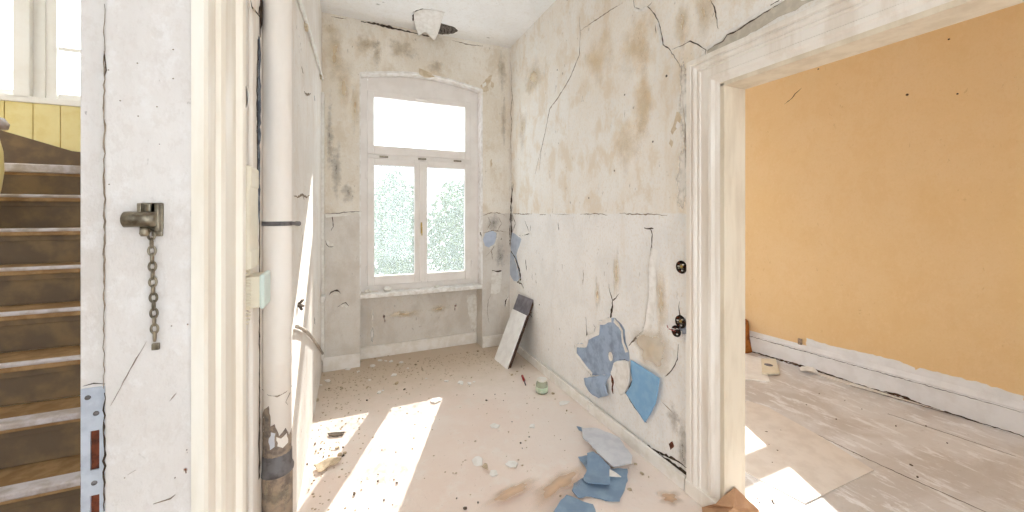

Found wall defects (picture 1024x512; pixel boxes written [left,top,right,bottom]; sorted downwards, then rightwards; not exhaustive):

peeling [412,9,458,40]
crack [509,0,706,270]
crack [85,4,107,511]
peeling [483,212,524,294]
peeling [574,289,660,423]
peeling [262,406,292,459]